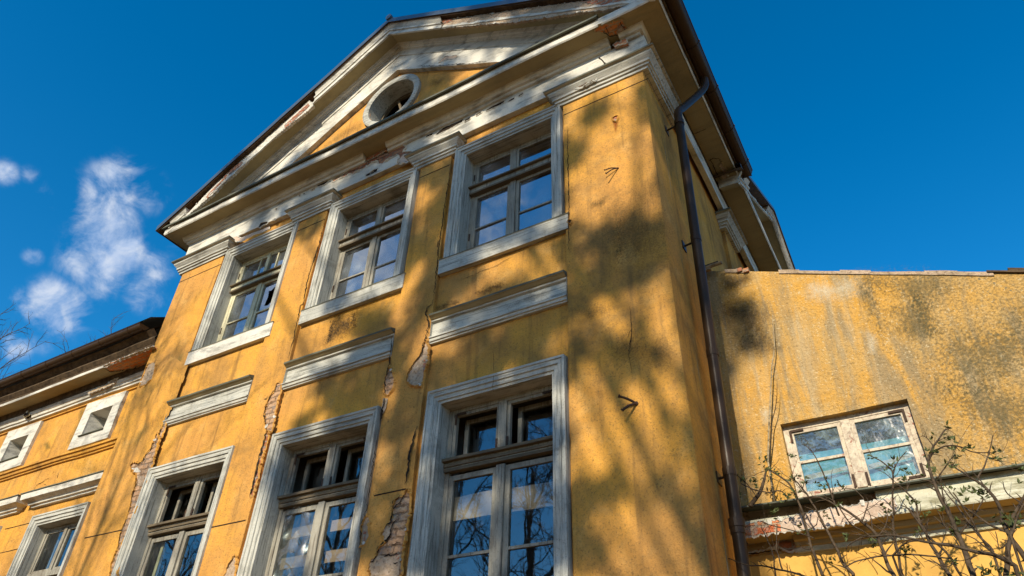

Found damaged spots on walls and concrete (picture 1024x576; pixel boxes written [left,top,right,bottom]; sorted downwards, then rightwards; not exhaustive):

crack [426,171,450,314]
spalling [380,309,431,422]
spalling [109,422,167,576]
spalling [249,381,282,498]
spalling [359,428,417,576]
flaking render [745,516,794,552]